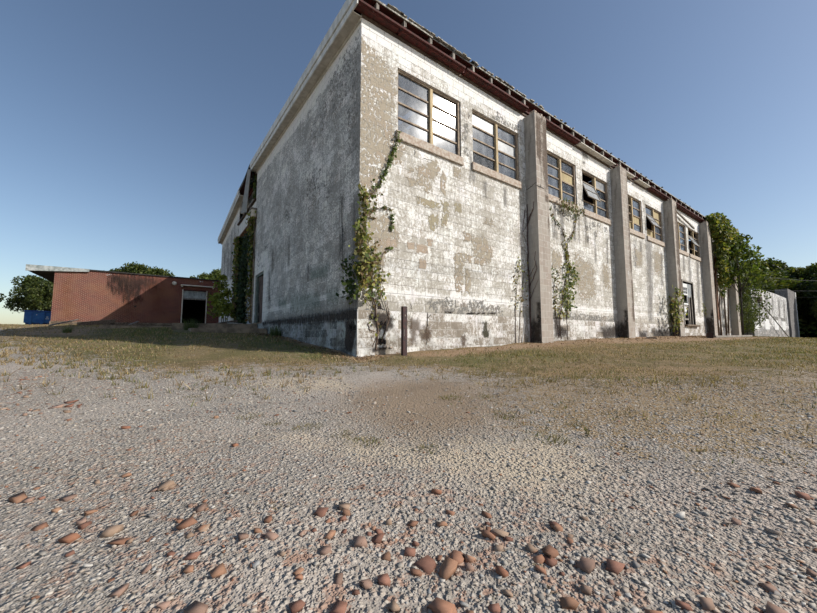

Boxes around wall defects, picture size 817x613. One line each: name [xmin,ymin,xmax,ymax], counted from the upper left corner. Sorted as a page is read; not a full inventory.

peeling [311,31,407,198]
peeling [367,160,462,269]
peeling [427,231,503,316]